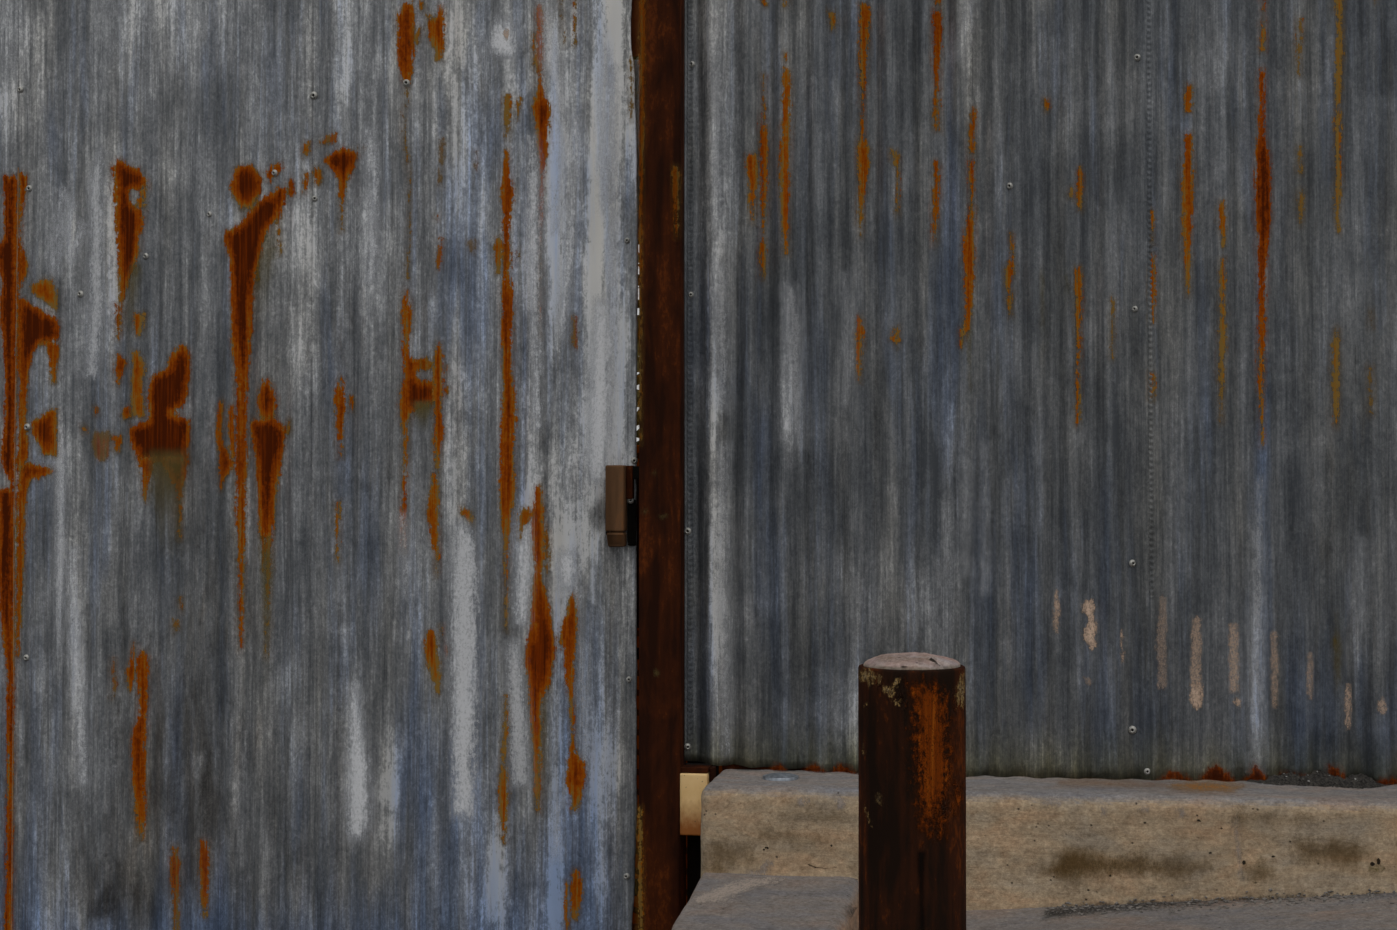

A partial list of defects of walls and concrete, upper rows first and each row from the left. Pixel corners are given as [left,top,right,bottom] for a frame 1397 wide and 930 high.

rust [0,172,60,930]
rust [111,642,151,841]
rust [82,159,192,539]
rust [215,132,366,658]
rust [396,0,449,578]
rust [497,694,509,845]
rust [493,0,587,814]
rust [635,807,644,930]
rust [1253,2,1273,446]